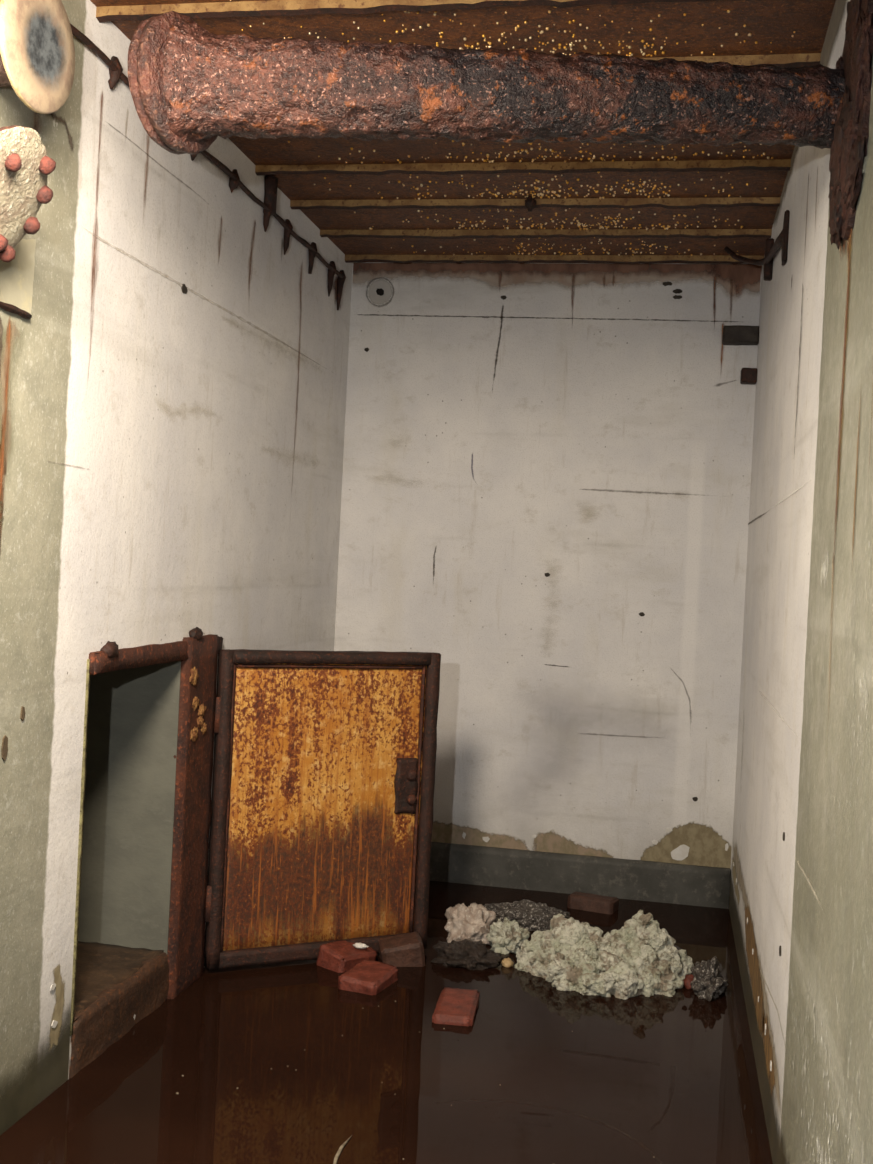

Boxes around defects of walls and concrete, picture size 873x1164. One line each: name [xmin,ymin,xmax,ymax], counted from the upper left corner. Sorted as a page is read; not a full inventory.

corrosion [0,318,16,532]
corrosion [834,229,852,546]
peeling [432,821,613,858]
peeling [641,823,775,1094]